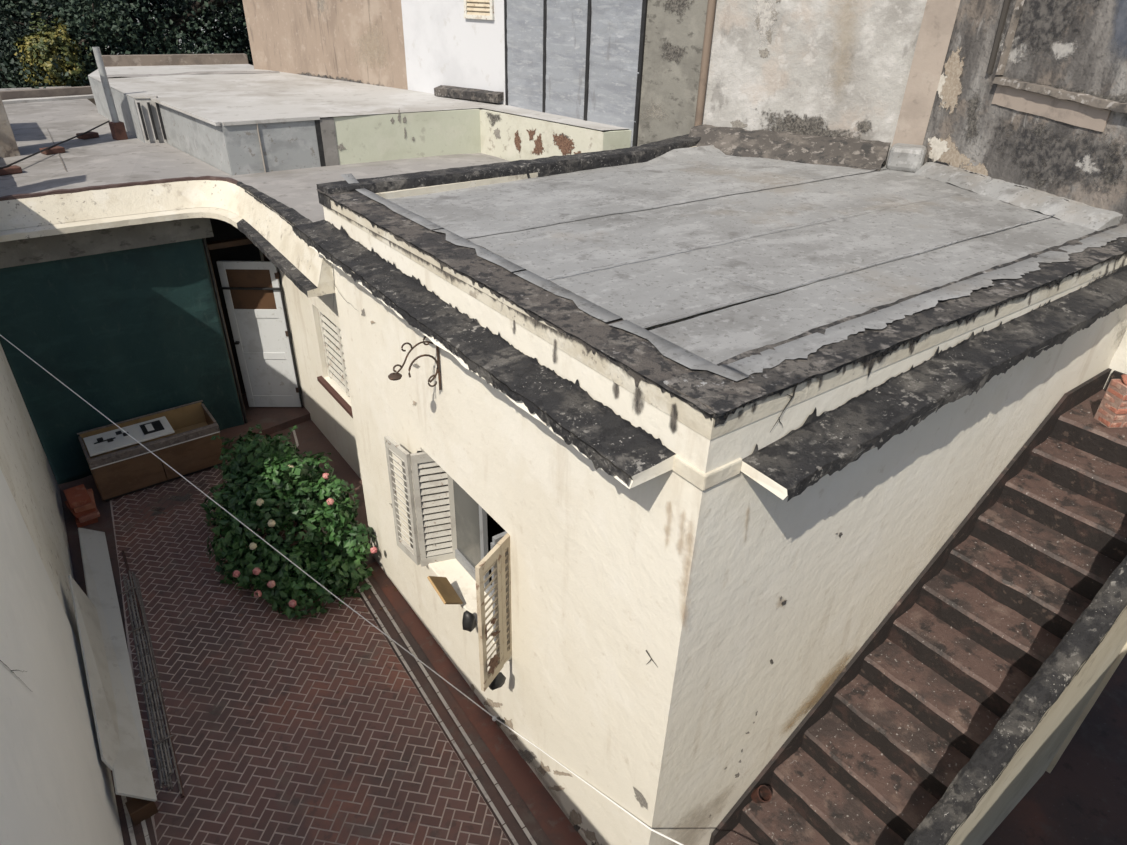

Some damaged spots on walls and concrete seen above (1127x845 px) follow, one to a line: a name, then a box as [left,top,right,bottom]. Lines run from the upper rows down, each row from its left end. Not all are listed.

water stain [1000,0,1099,63]
water stain [1113,0,1127,58]
peeling [493,128,581,156]
peeling [928,46,988,176]
water stain [964,93,980,141]
water stain [995,119,1127,194]
water stain [1009,79,1127,103]
water stain [788,659,848,728]
peeling [484,699,572,791]
peeling [568,810,602,845]